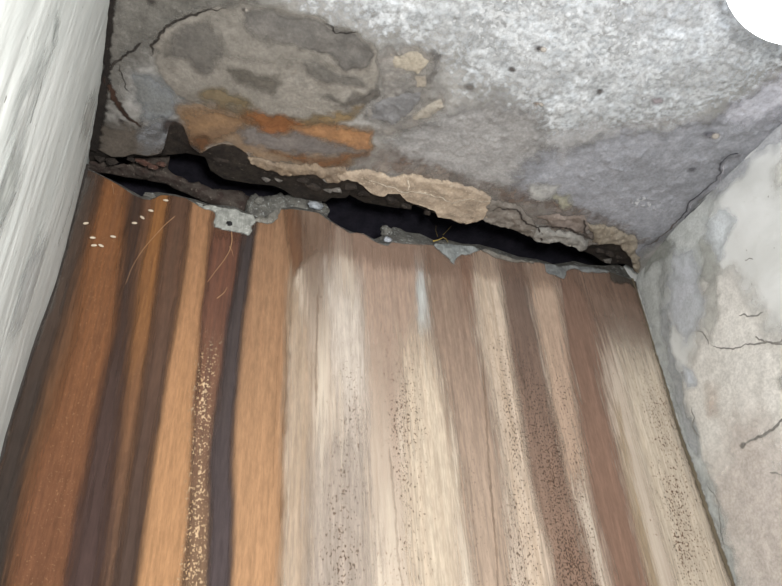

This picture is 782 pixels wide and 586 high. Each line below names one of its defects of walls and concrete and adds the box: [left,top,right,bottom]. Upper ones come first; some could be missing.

leakage [80,0,256,157]
corrosion [175,88,607,245]
flaking render [195,202,281,235]
flaking render [248,157,641,273]
flaking render [545,264,609,279]
crack [697,331,782,350]
crack [740,419,782,448]